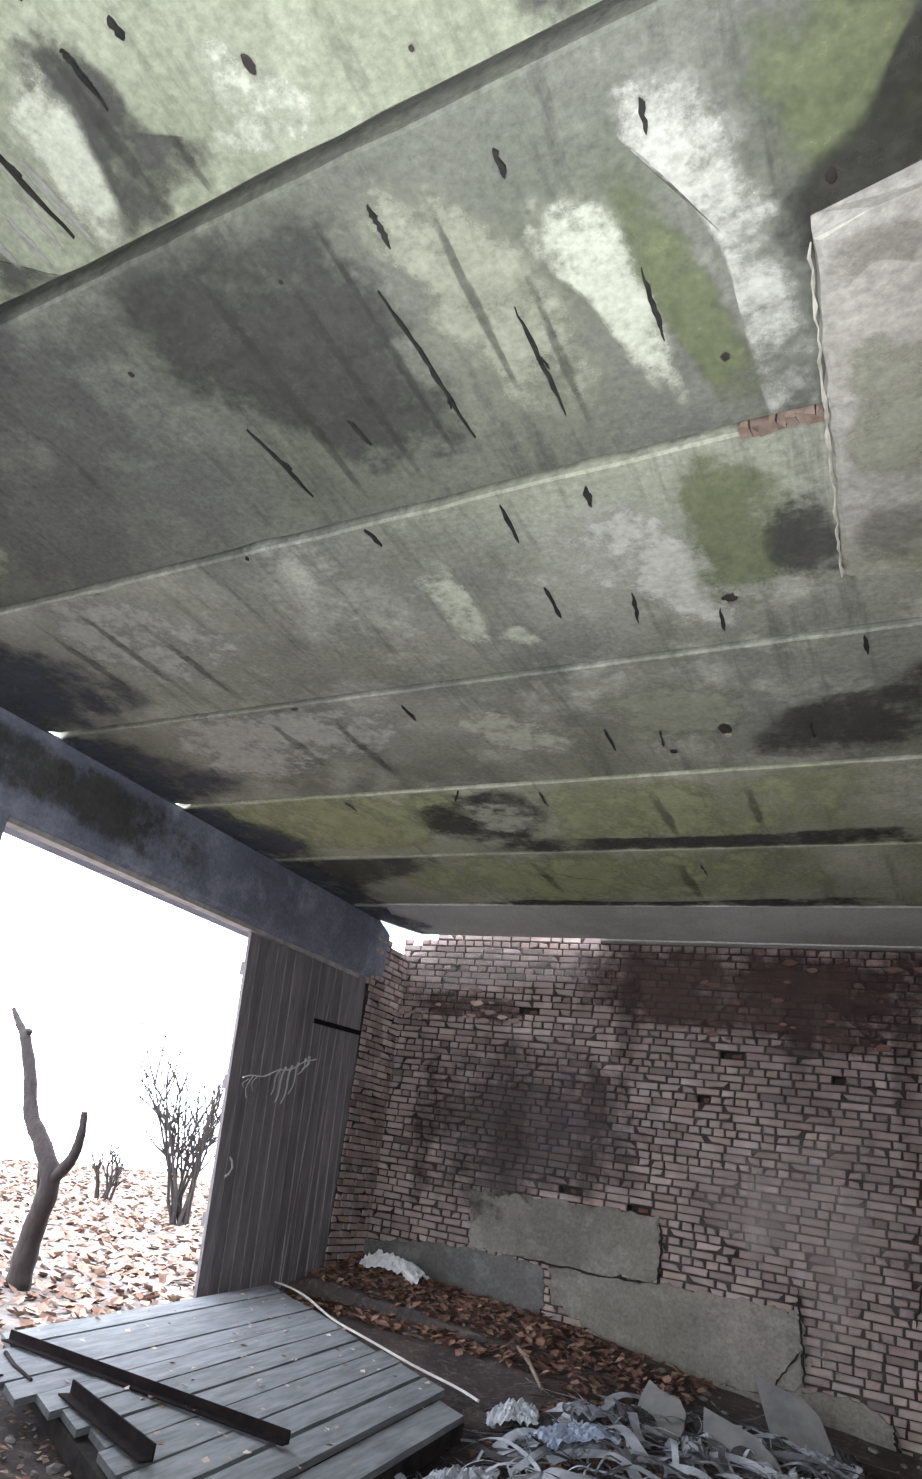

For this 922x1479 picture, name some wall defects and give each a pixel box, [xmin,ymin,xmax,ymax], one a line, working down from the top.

water stain [9,42,202,243]
crack [0,154,75,239]
water stain [617,11,922,409]
water stain [125,225,464,465]
crack [378,290,476,439]
crack [514,306,567,416]
crack [247,429,314,498]
water stain [766,503,842,574]
water stain [759,666,922,754]
water stain [423,793,915,853]
crack [914,1286,922,1330]
crack [893,1425,902,1454]